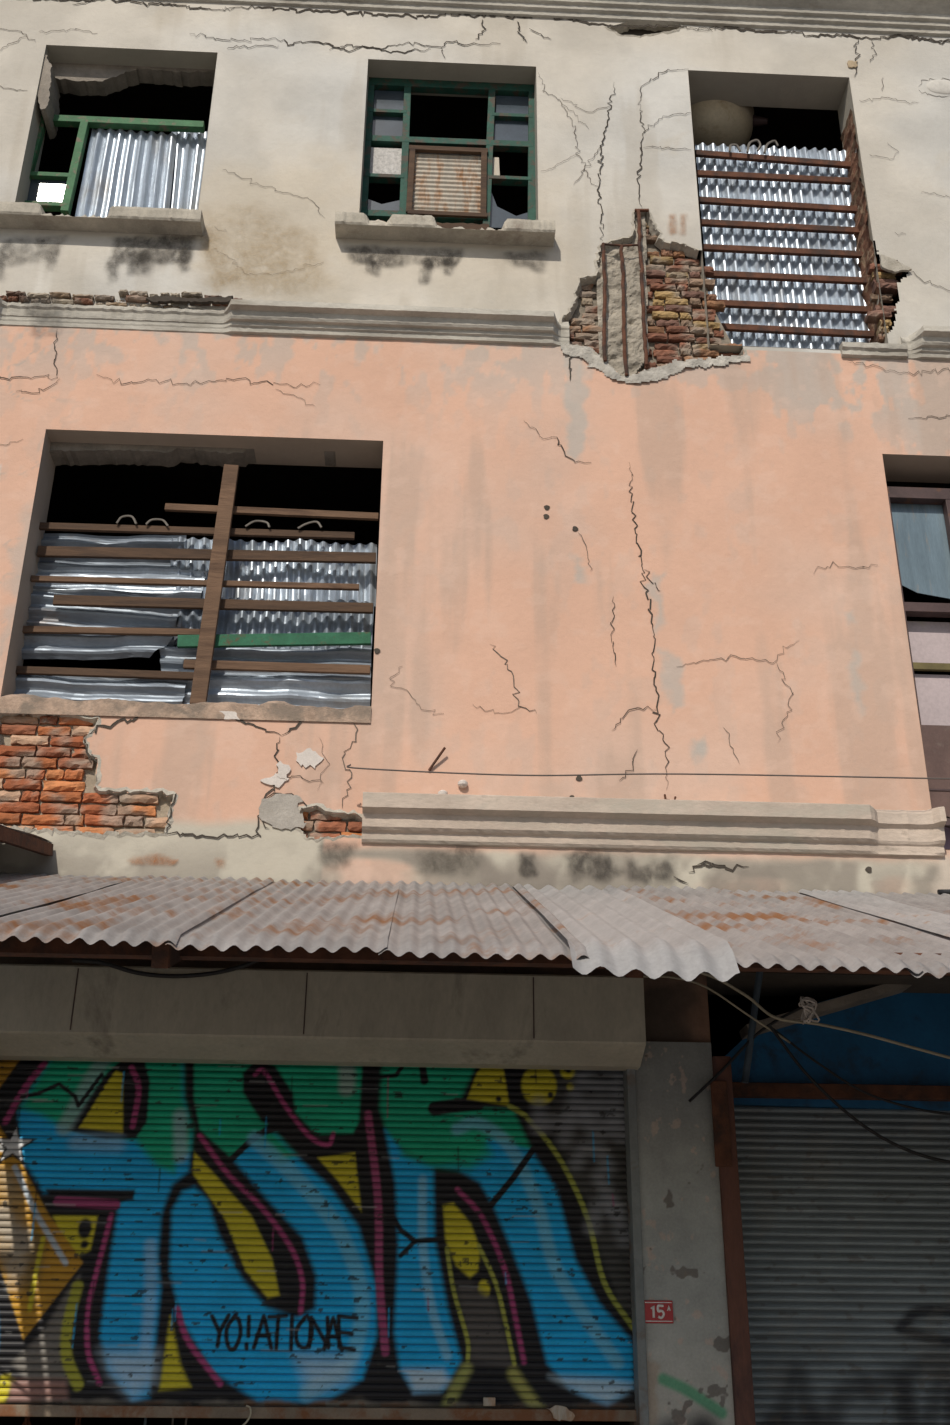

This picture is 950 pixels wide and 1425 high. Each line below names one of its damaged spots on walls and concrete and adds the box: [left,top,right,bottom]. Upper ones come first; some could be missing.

crack [0,0,950,104]
crack [541,69,691,241]
flaking render [0,289,242,308]
flaking render [559,208,750,383]
crack [0,331,60,393]
crack [610,470,797,786]
peeling [220,711,240,720]
crack [477,645,536,713]
flaking render [0,713,178,840]
flaking render [259,748,362,843]
damp [521,857,535,875]
damp [572,852,672,881]